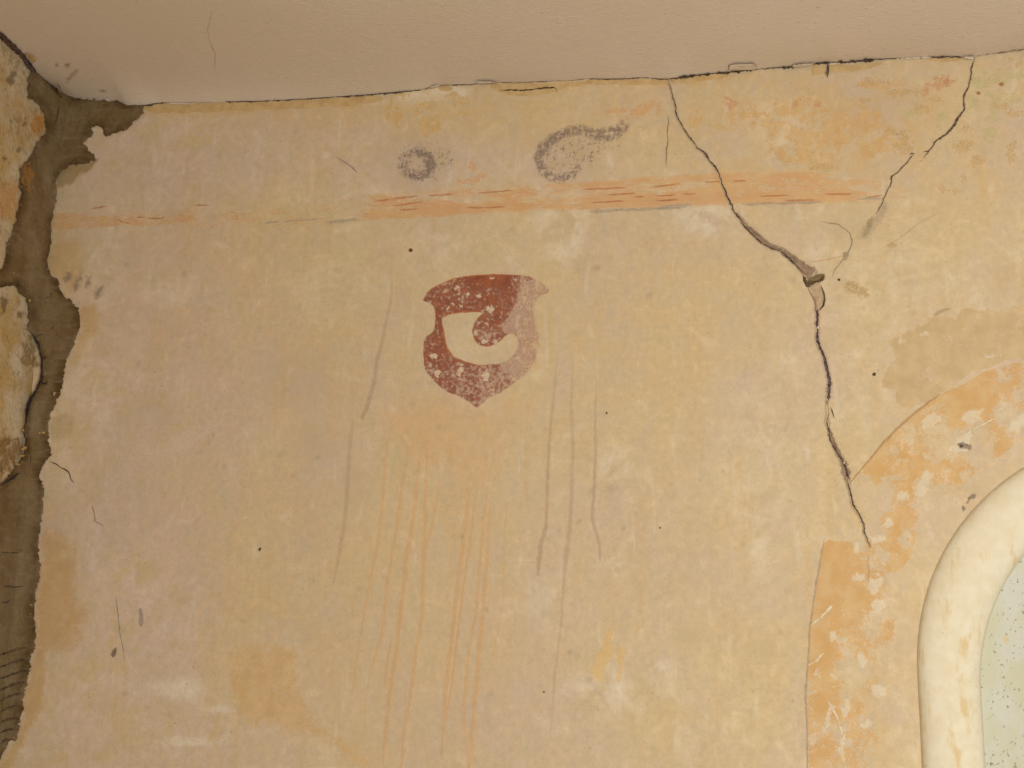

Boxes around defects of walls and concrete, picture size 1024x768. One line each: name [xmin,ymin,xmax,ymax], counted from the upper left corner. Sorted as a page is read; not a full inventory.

crack [144,49,1024,586]